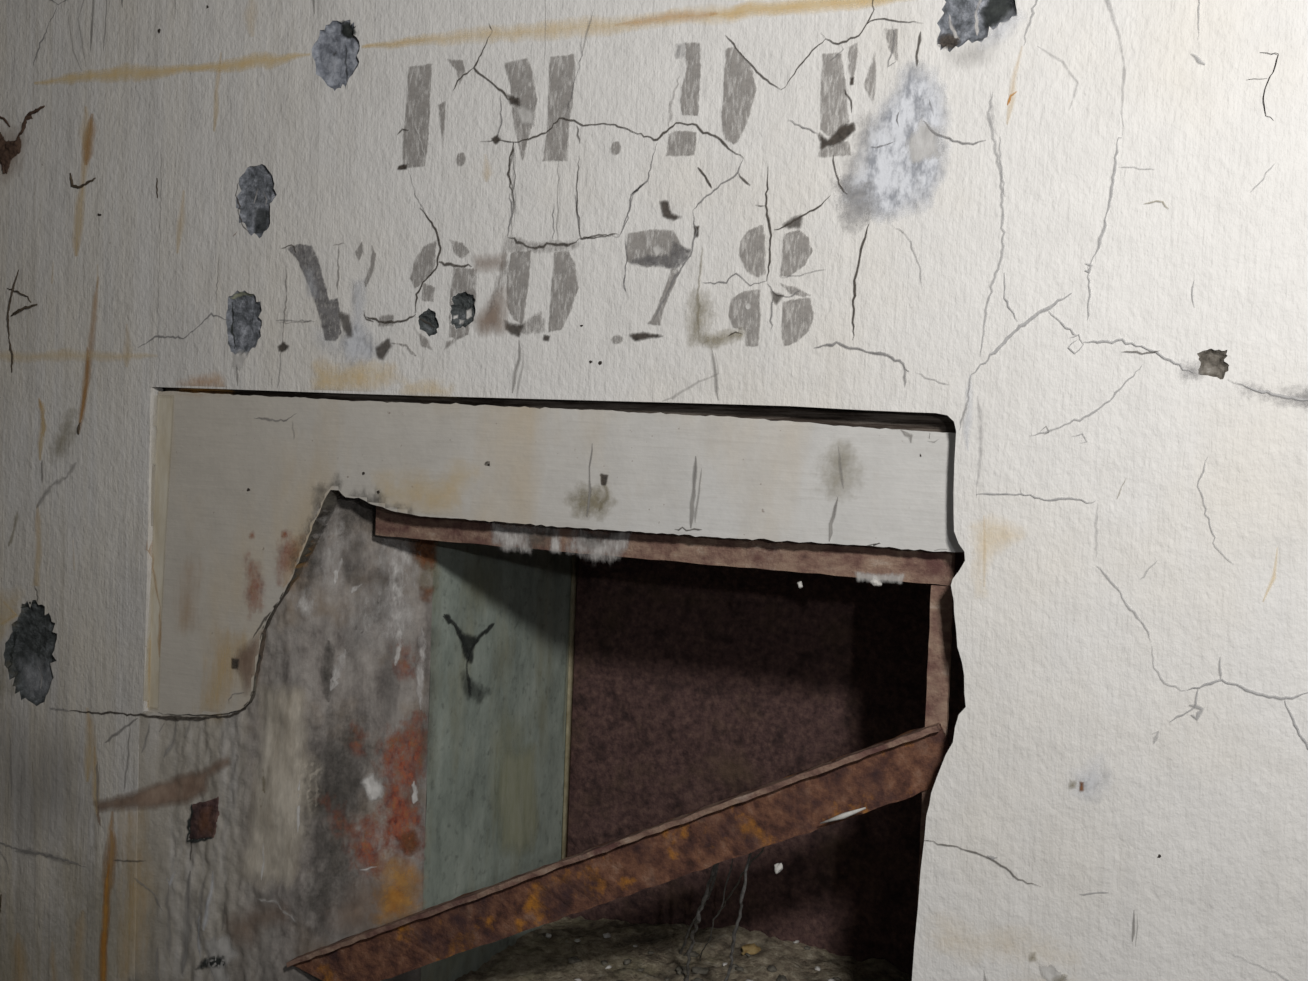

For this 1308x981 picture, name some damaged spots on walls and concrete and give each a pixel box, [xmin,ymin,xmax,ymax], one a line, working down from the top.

spalling [312,20,360,91]
crack [726,1,921,89]
spalling [937,0,1017,52]
crack [367,175,472,324]
crack [454,24,848,329]
crack [814,120,1194,443]
rust [414,539,437,594]
peeling [493,522,629,560]
spalling [3,588,57,706]
rust [95,759,228,981]
peeling [242,688,319,882]
rust [354,731,424,915]